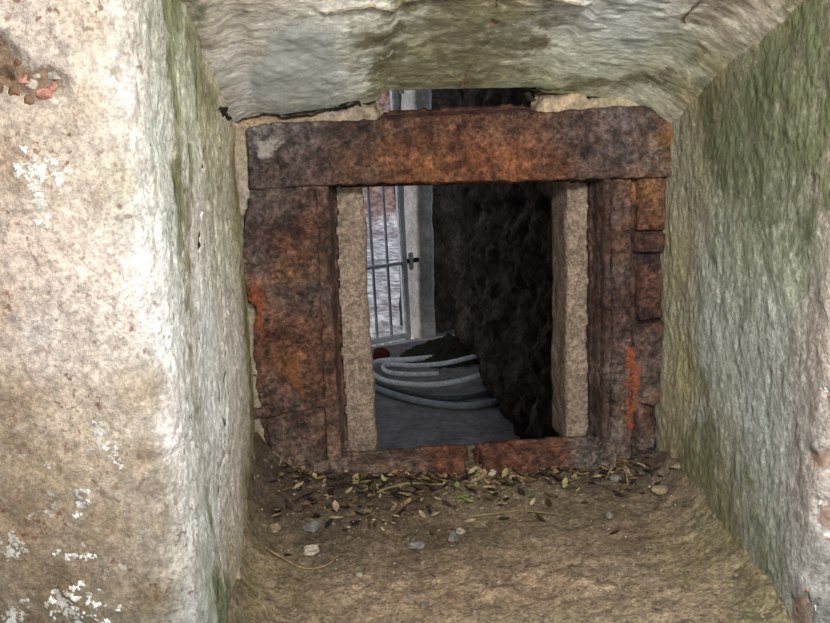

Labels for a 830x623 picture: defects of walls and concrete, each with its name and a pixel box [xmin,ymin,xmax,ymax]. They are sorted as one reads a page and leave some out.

damp [361,0,429,93]
damp [528,36,550,49]
damp [167,37,194,219]
corrosion [625,347,641,433]